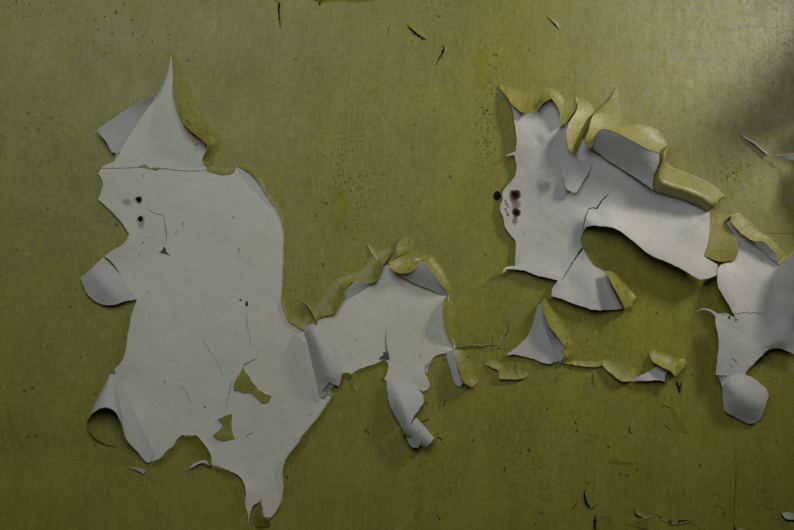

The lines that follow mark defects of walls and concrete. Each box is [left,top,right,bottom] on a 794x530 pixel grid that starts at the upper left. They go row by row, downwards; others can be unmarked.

peeling [80,53,489,527]
peeling [485,84,794,424]
spalling [781,512,794,522]